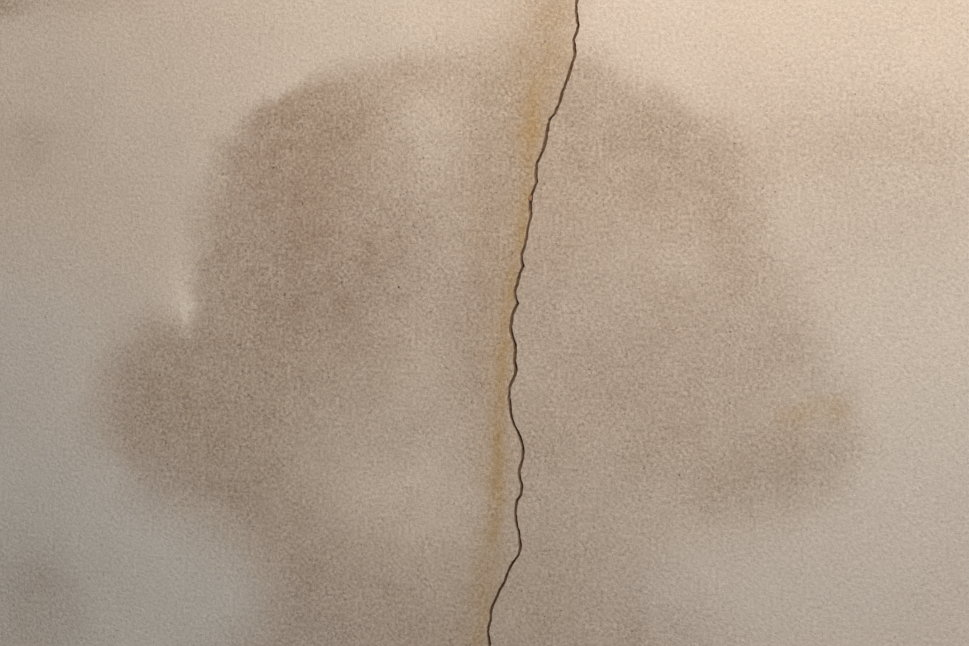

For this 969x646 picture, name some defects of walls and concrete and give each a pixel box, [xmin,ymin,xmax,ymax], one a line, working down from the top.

water stain [61,13,493,646]
rust [433,0,577,646]
crack [487,0,580,646]
water stain [488,0,969,646]